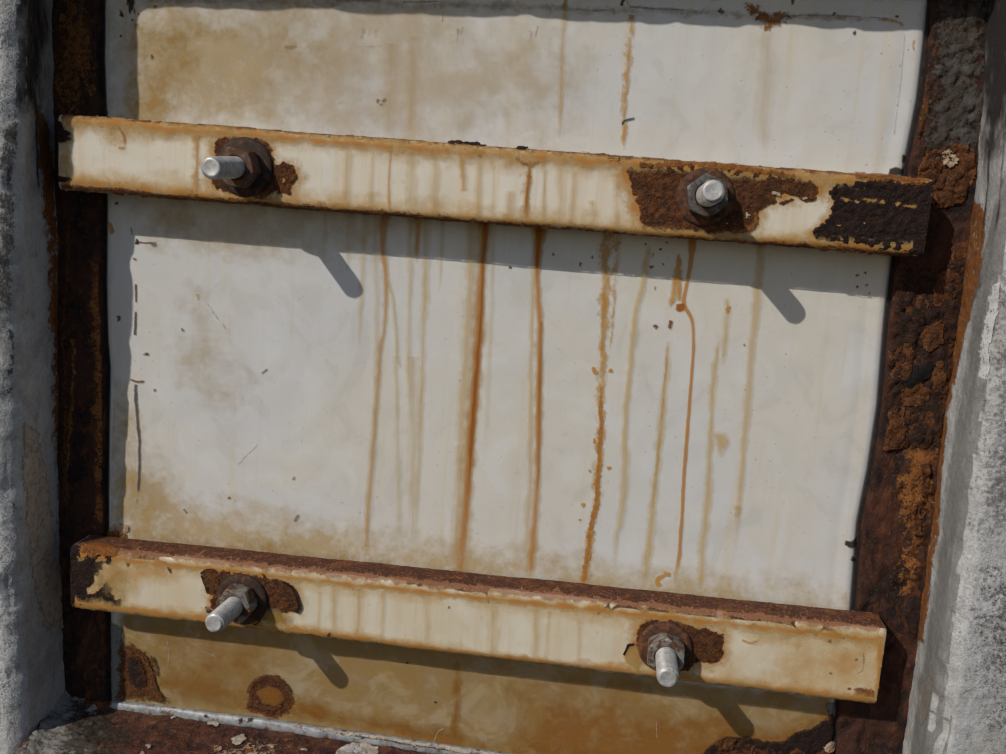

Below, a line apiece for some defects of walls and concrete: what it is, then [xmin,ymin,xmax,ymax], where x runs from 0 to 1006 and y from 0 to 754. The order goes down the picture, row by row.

rust [120,0,139,29]
rust [745,0,794,31]
rust [621,15,634,141]
rust [36,104,986,709]
rust [246,674,322,719]
leakage [120,613,831,754]
rust [692,714,836,754]